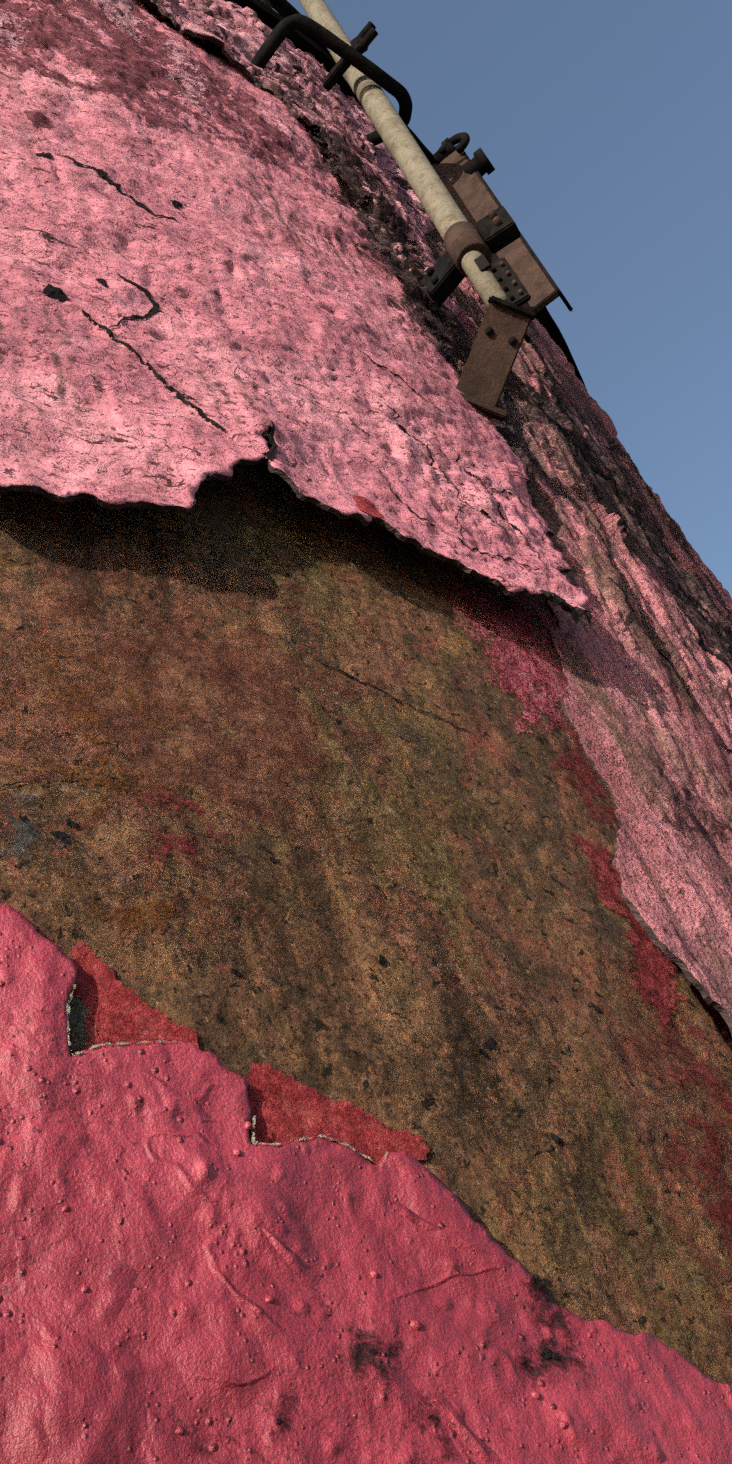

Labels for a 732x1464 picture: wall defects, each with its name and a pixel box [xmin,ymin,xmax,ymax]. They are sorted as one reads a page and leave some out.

peeling [0,0,315,174]
crack [53,152,178,222]
crack [82,273,226,436]
crack [262,420,277,460]
spalling [0,436,732,1386]